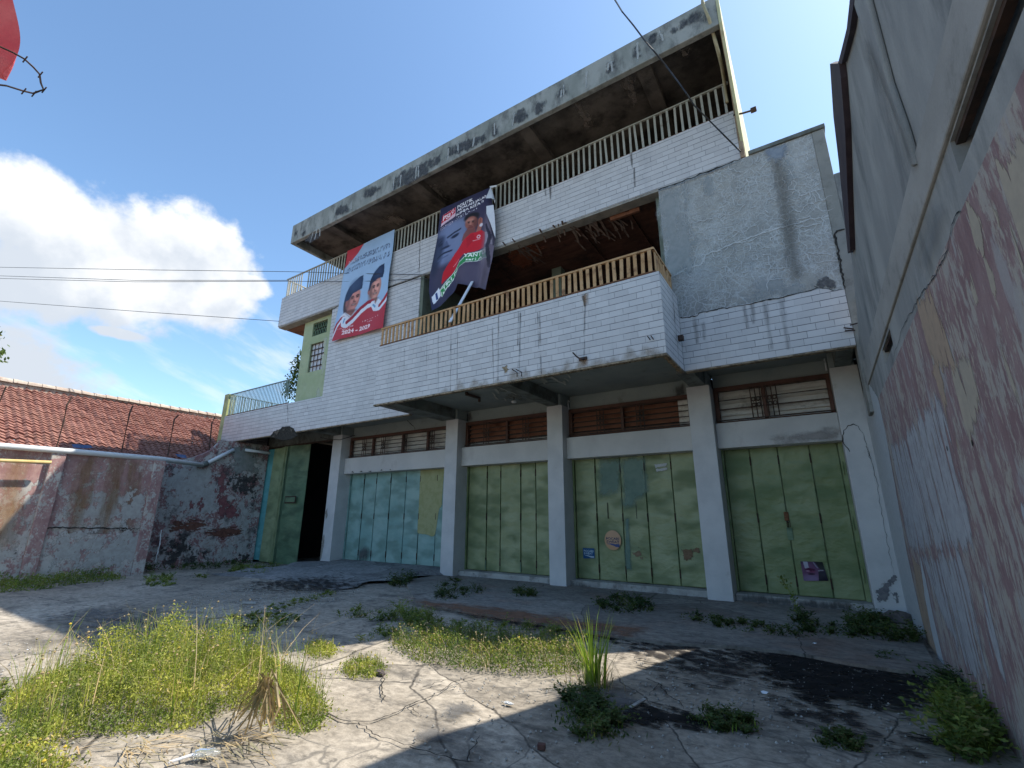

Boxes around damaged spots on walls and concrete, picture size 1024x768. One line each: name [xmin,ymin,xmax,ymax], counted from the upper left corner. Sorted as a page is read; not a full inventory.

damp [633,12,706,62]
damp [512,103,544,126]
damp [364,123,497,201]
peeling [991,135,1024,272]
crack [658,147,845,357]
crack [892,211,959,362]
peeling [951,355,980,443]
peeling [40,466,147,576]
crack [47,527,162,562]
peeling [161,461,253,565]
spalling [876,575,899,603]
crack [325,674,486,764]